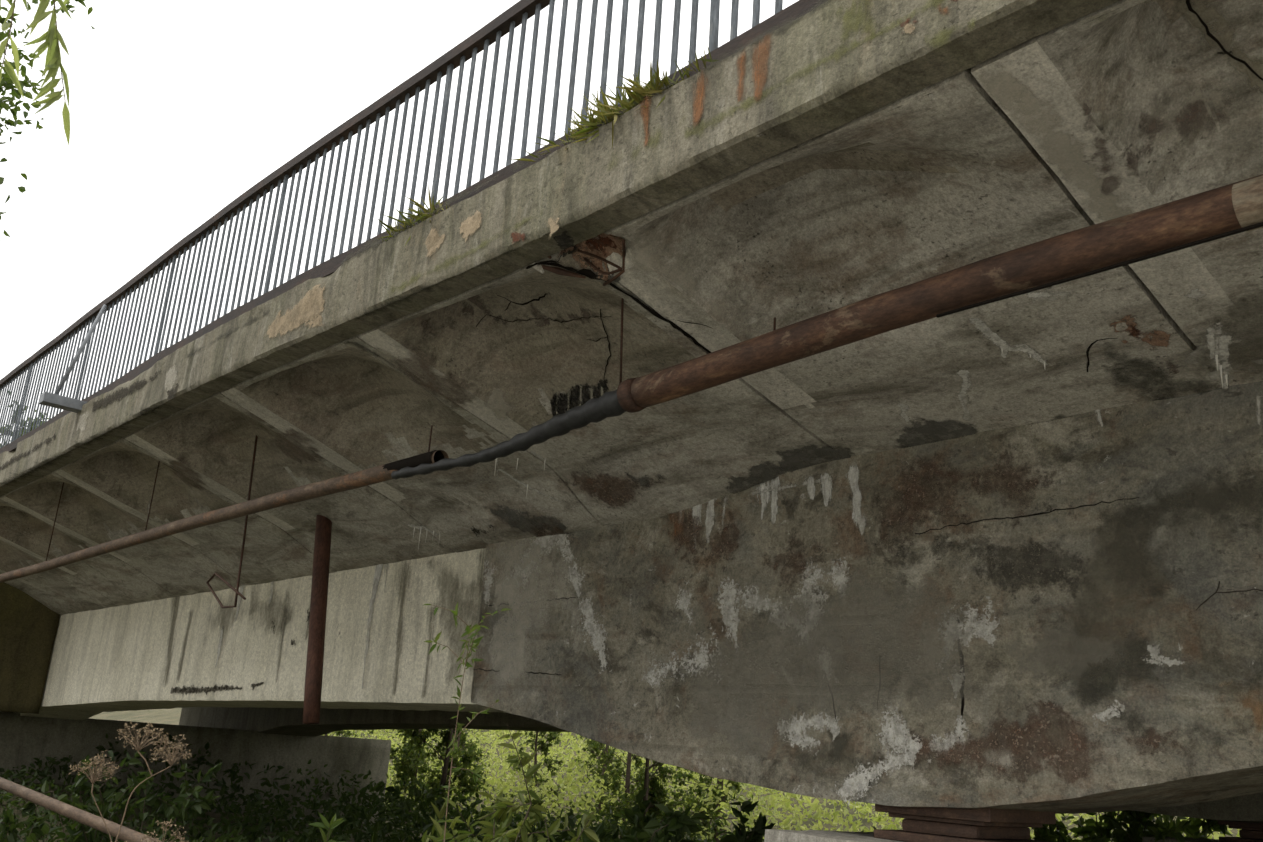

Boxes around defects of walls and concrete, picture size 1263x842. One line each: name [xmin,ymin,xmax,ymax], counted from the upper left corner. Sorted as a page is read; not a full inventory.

rust [737,39,770,101]
crack [1186,0,1263,81]
spalling [532,217,626,286]
crack [476,260,713,377]
damp [1109,294,1263,401]
damp [679,498,726,549]
damp [753,473,832,523]
damp [846,465,866,535]
crack [915,497,1139,534]
damp [1106,471,1263,597]
damp [1048,625,1155,705]